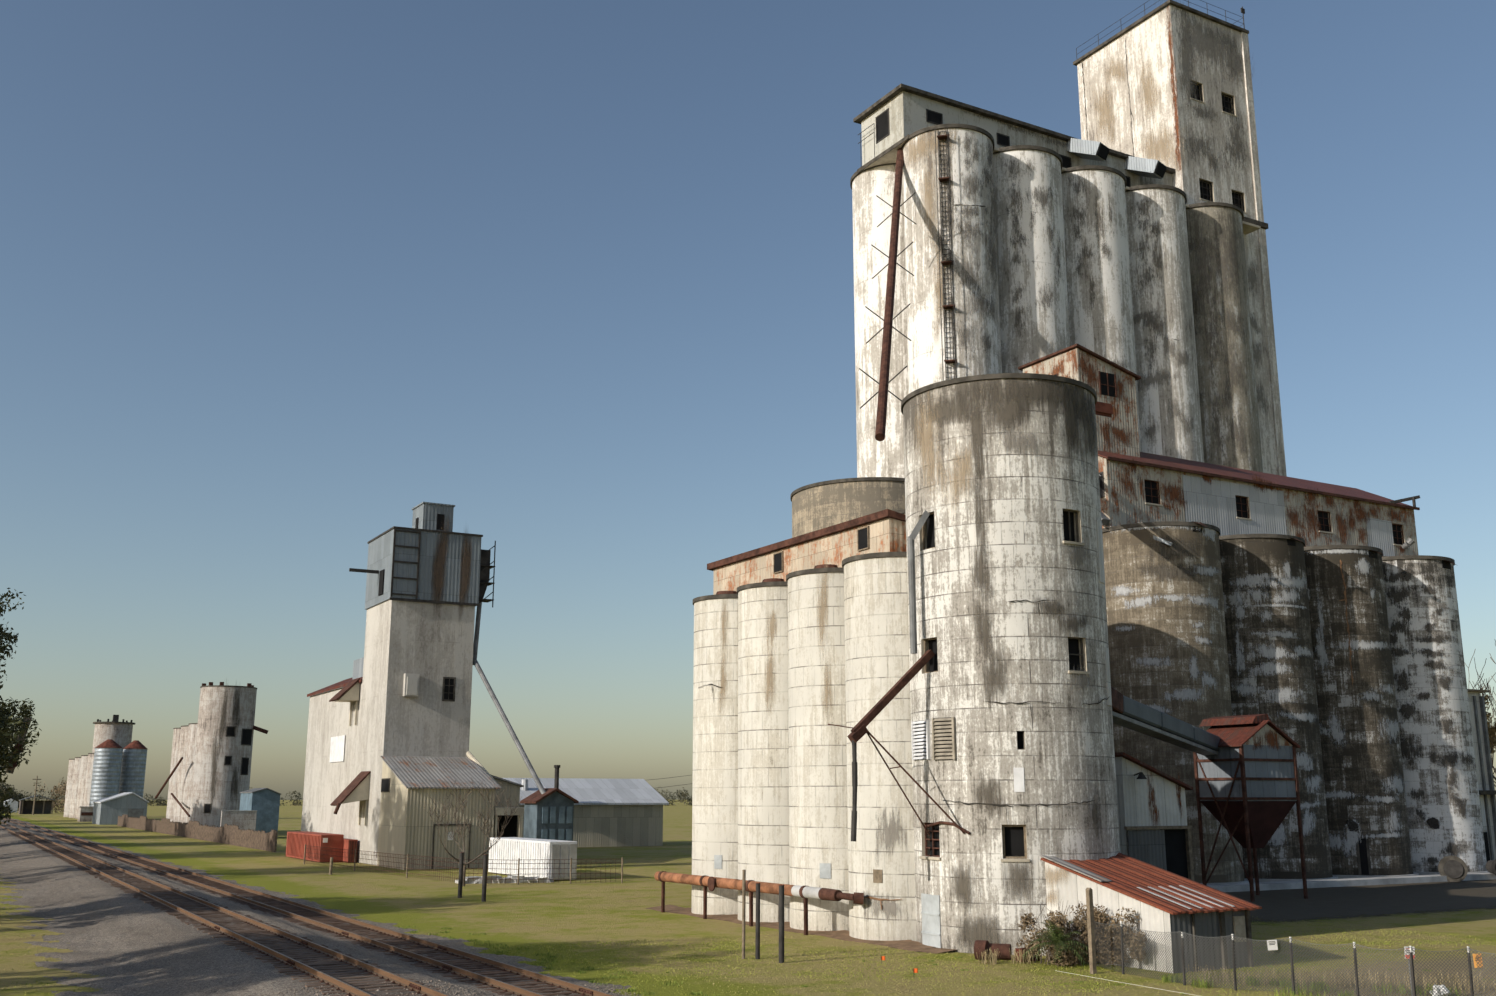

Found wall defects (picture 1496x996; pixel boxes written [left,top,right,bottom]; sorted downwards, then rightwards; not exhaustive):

leakage [1165,4,1244,109]
leakage [1096,61,1177,169]
rust [1051,352,1098,399]
leakage [1133,312,1193,440]
rust [1096,423,1134,451]
rust [1119,464,1187,510]
leakage [917,379,1098,710]
leakage [1142,537,1204,581]
rust [1287,489,1405,545]
leakage [974,778,1001,817]
leakage [952,864,999,946]
leakage [1001,862,1033,900]